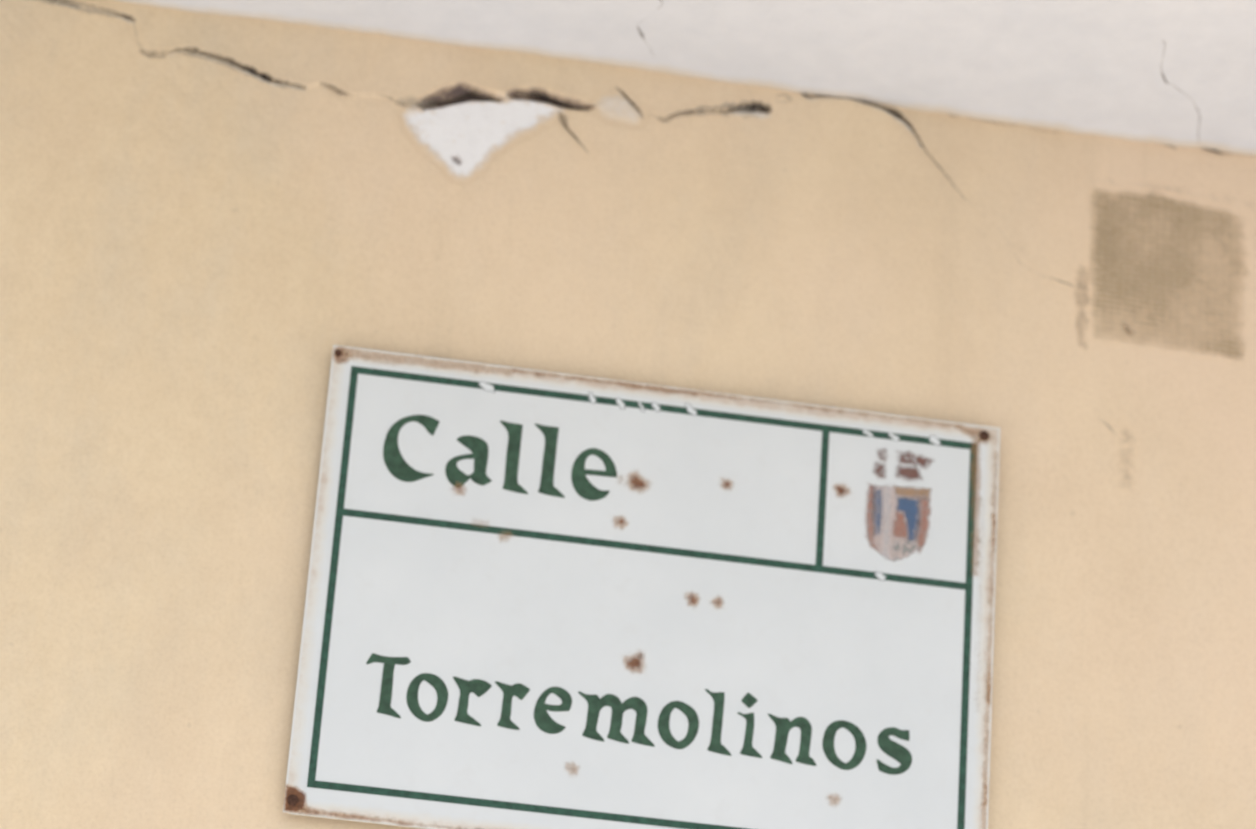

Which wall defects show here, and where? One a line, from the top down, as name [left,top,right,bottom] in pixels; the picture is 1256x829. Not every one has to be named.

crack [35,0,341,93]
spalling [398,84,648,184]
crack [691,102,771,121]
crack [797,92,954,185]